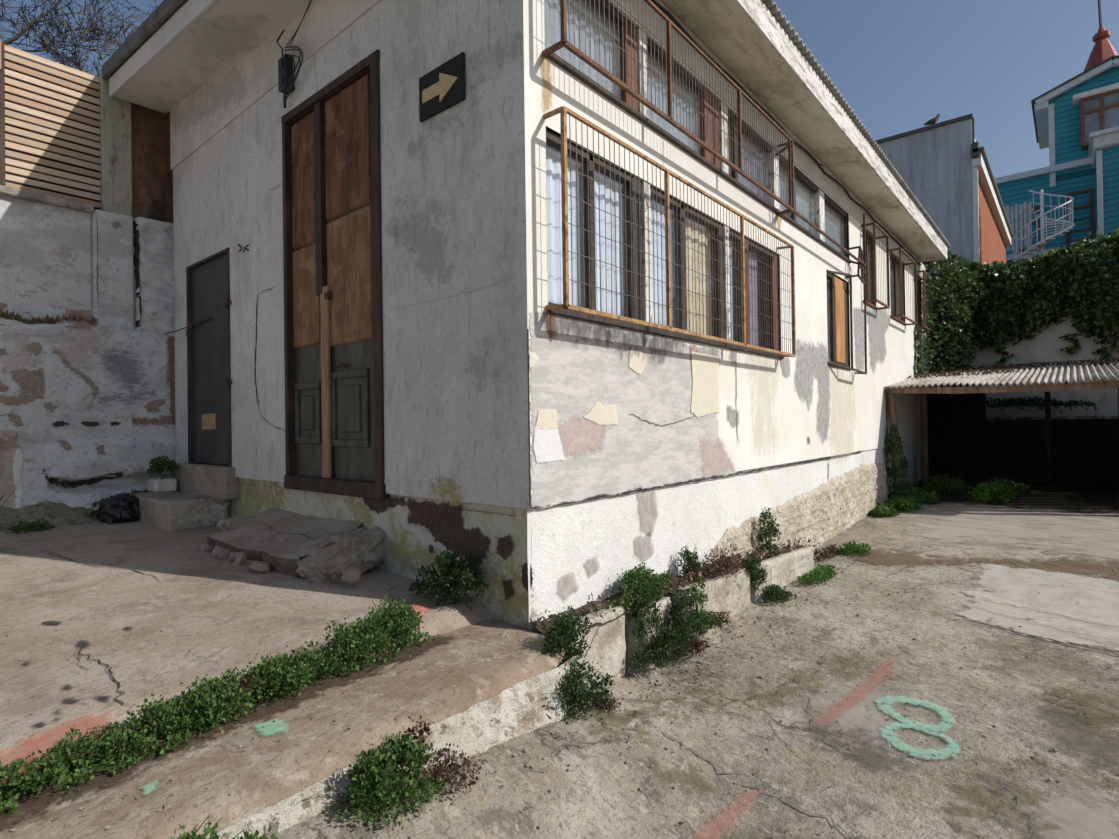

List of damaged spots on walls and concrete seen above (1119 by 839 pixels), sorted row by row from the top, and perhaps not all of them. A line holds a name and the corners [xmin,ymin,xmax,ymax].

corrosion [541,53,552,110]
corrosion [546,311,556,341]
flaking render [0,342,58,508]
flaking render [81,399,176,427]
flaking render [529,312,736,561]
peeling [363,480,513,567]
crack [42,549,161,582]
peeling [502,563,533,600]
flaking render [558,557,599,599]
crack [74,647,135,710]